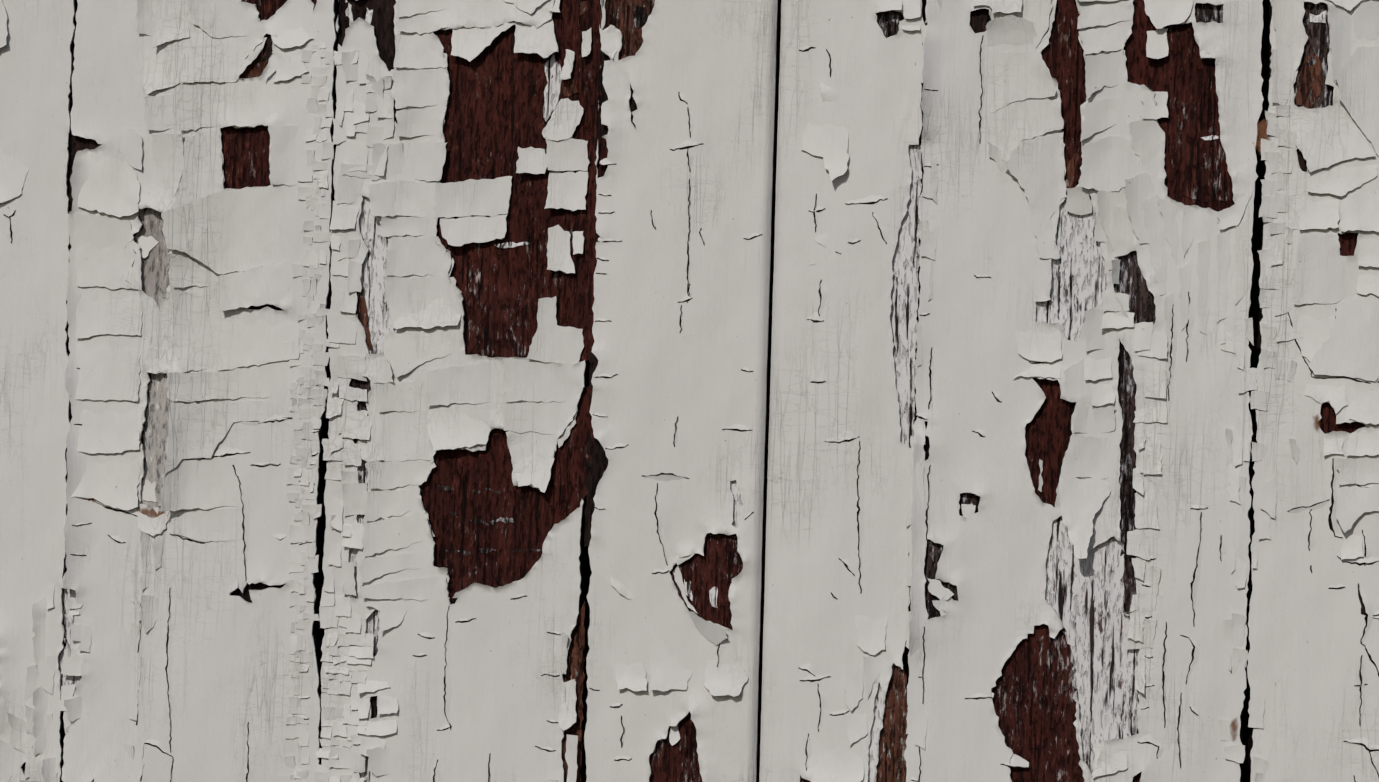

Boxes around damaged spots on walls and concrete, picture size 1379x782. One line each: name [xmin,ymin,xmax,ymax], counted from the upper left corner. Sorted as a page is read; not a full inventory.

peeling [0,142,29,203]
peeling [7,583,145,782]
peeling [67,0,655,782]
peeling [650,712,702,782]
peeling [613,480,748,697]
peeling [800,145,958,782]
peeling [959,493,980,516]
peeling [970,0,1379,782]